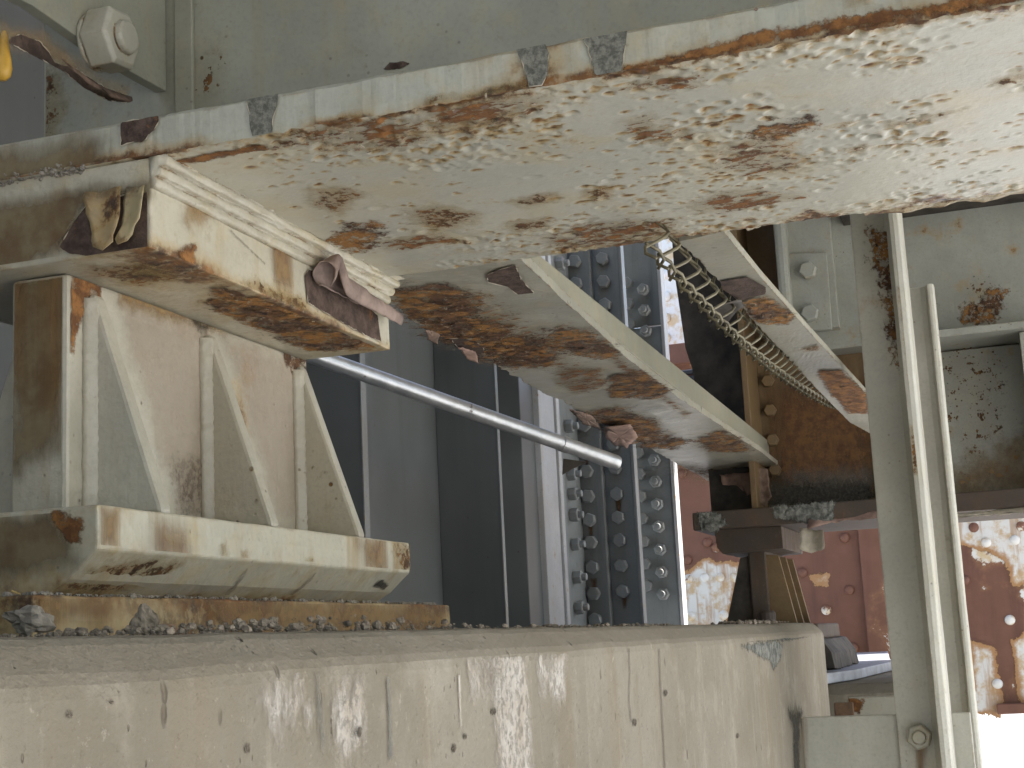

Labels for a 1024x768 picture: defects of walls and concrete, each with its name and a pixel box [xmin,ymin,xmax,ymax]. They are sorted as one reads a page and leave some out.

rust [618,0,1019,91]
rust [176,85,543,164]
peeling [60,185,147,256]
peeling [305,254,404,342]
rust [384,282,755,453]
rust [679,370,875,507]
peeling [684,557,739,625]
peeling [958,518,1024,587]
damp [267,682,363,756]
damp [468,656,530,768]
damp [539,653,565,699]
peeling [970,640,1004,719]